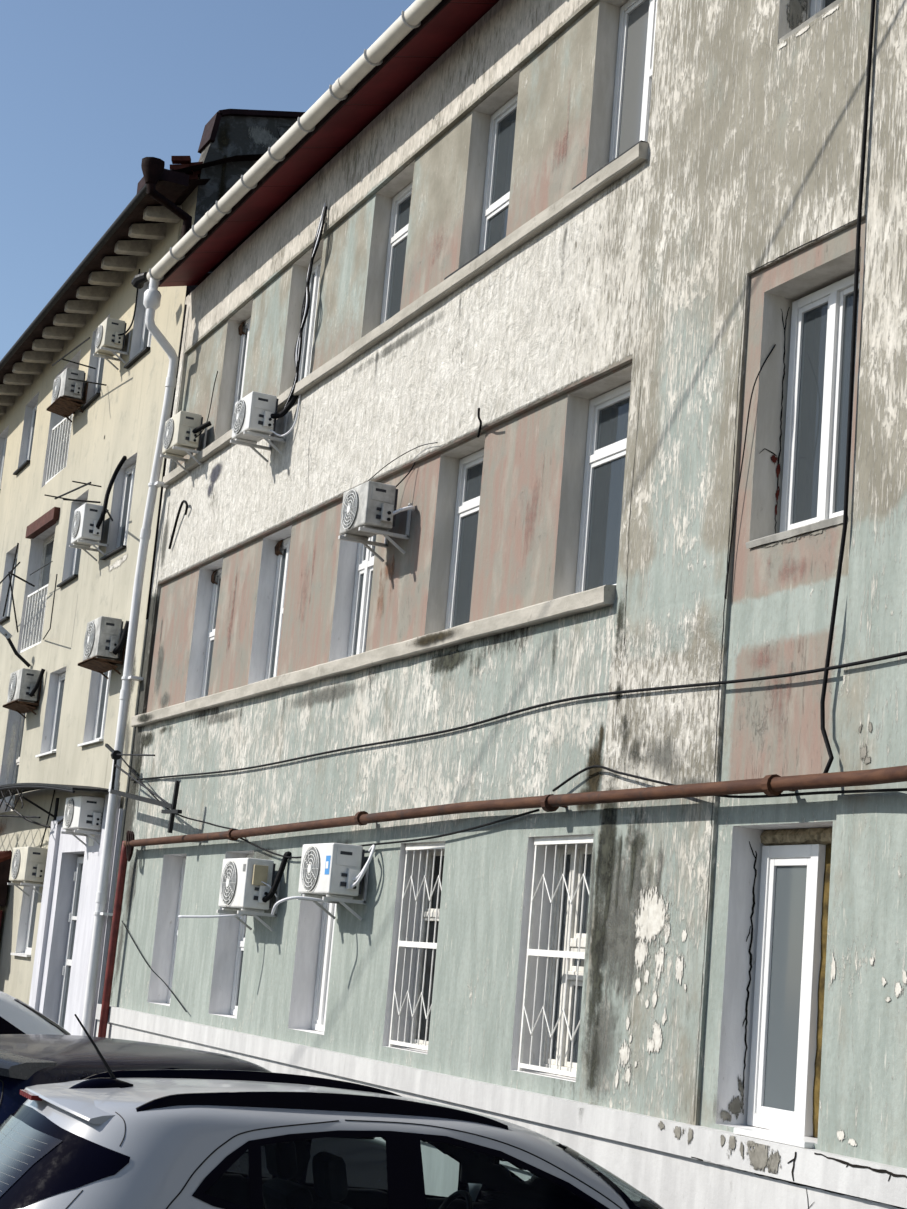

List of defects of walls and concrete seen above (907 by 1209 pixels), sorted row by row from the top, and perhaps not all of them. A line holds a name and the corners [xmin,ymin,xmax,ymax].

crack [693,215,865,1122]
leakage [622,716,672,769]
leakage [586,777,645,1087]
peeling [615,857,687,1089]
peeling [881,970,907,1002]
spalling [657,1121,693,1144]
spalling [720,1076,781,1179]
crack [691,1148,907,1209]